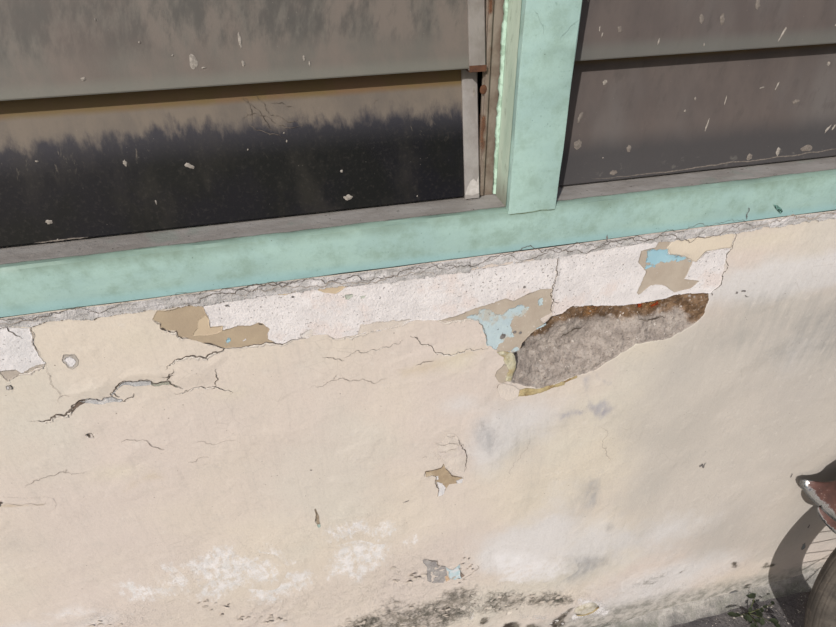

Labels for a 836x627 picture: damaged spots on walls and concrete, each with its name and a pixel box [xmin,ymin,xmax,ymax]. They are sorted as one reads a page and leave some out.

peeling [152,234,735,396]
peeling [0,327,46,390]
crack [32,348,233,424]
crack [311,336,489,387]
peeling [424,464,463,496]
damp [28,511,633,627]
peeling [390,558,479,584]